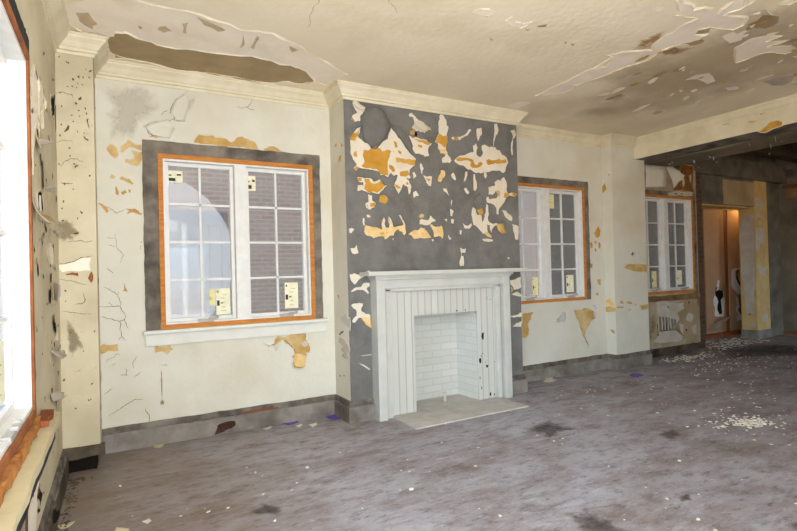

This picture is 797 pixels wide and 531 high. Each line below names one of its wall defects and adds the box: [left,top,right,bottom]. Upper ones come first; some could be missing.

peeling [507,0,797,113]
peeling [36,317,67,381]
peeling [30,63,99,305]
crack [59,240,141,376]
flaking render [97,133,323,331]
flaking render [263,333,312,370]
peeling [335,100,519,242]
peeling [510,276,523,297]
peeling [511,312,534,339]
flaking render [518,160,700,349]
flaking render [21,481,45,531]